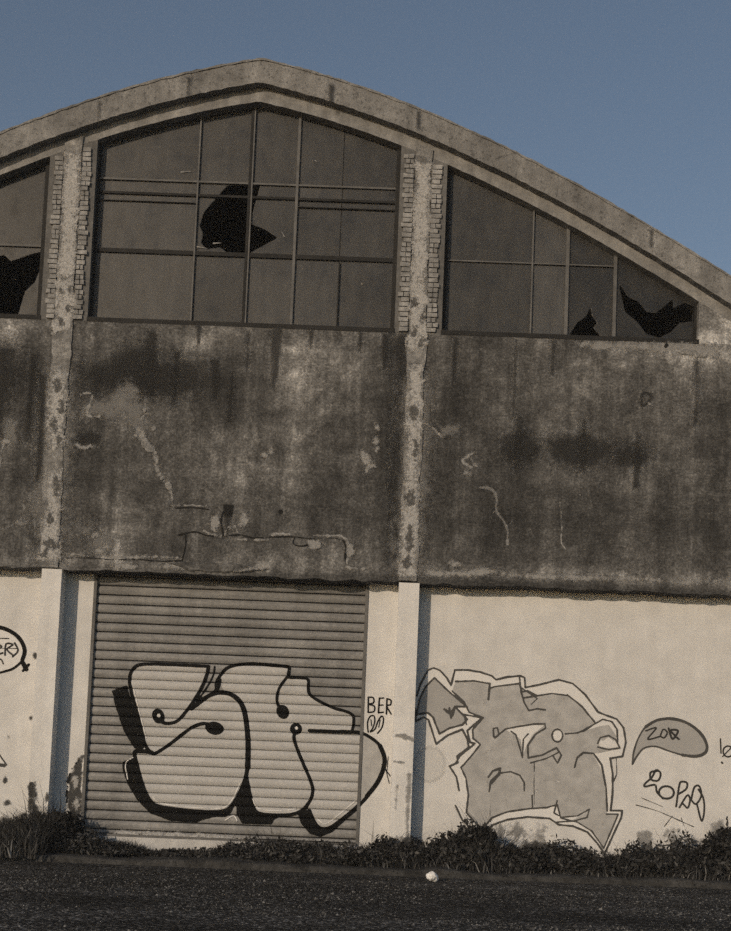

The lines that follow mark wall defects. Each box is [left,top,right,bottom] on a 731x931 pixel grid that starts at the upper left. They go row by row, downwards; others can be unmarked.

damp [27,361,45,476]
damp [554,434,605,464]
crack [479,486,512,546]